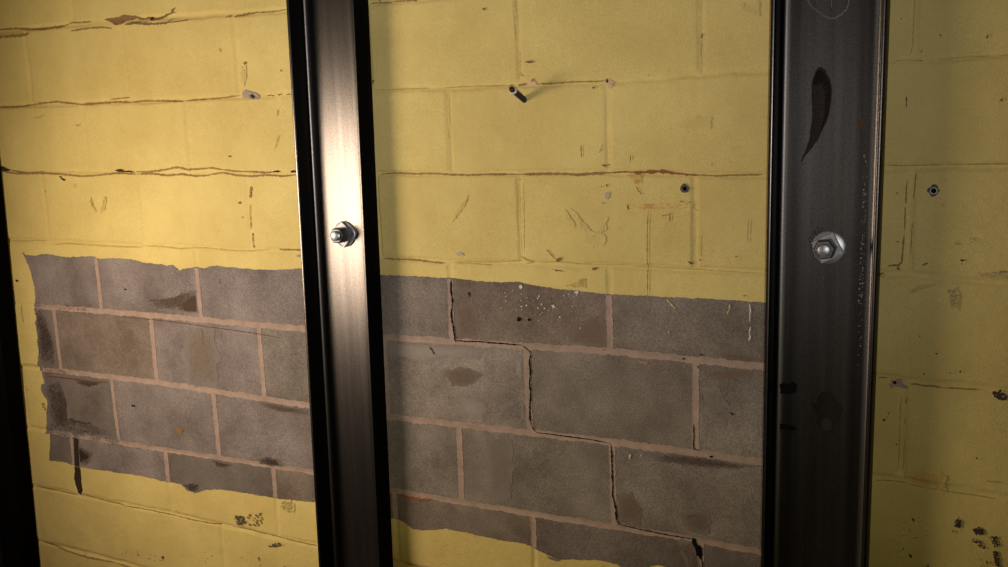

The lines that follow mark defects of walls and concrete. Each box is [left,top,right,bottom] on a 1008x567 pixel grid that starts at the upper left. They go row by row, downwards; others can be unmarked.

peeling [22,252,315,502]
leakage [234,513,262,526]
crack [380,169,762,567]
peeling [380,275,766,567]
leakage [970,520,1008,567]